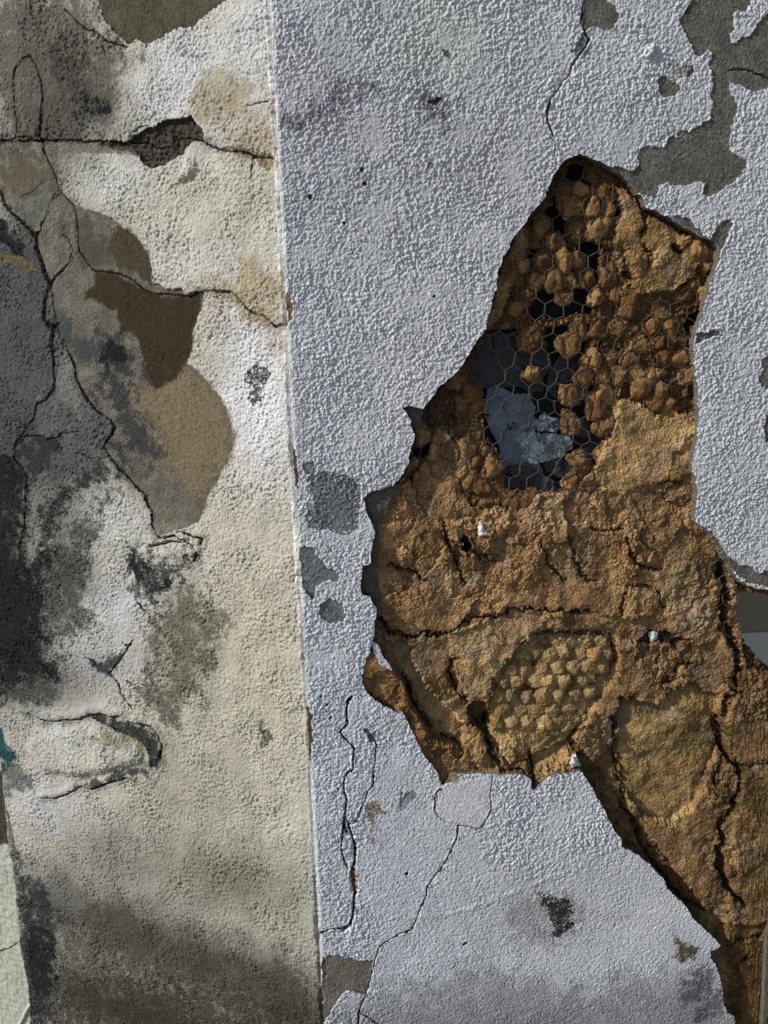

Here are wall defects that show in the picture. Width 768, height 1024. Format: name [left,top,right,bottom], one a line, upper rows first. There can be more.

peeling [99,0,226,48]
crack [546,0,590,153]
peeling [0,115,233,536]
damp [0,212,236,718]
crack [0,54,287,570]
spalling [293,0,768,1024]
crack [319,696,378,934]
crack [356,778,492,1024]